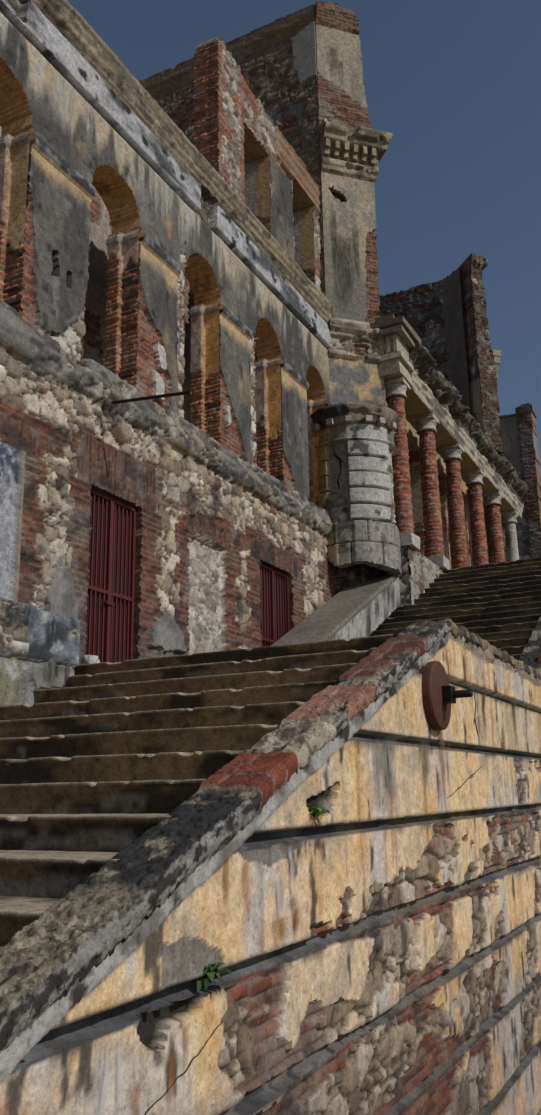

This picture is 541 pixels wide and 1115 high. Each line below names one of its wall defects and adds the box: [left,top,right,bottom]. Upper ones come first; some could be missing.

damp [331,218,359,299]
spalling [216,333,259,467]
spalling [280,450,296,491]
crack [333,447,343,490]
flaking render [45,556,80,619]
flaking render [149,607,187,651]
spalling [160,934,225,987]
spalling [215,757,541,1115]
spalling [133,994,208,1050]
crack [145,1021,222,1115]